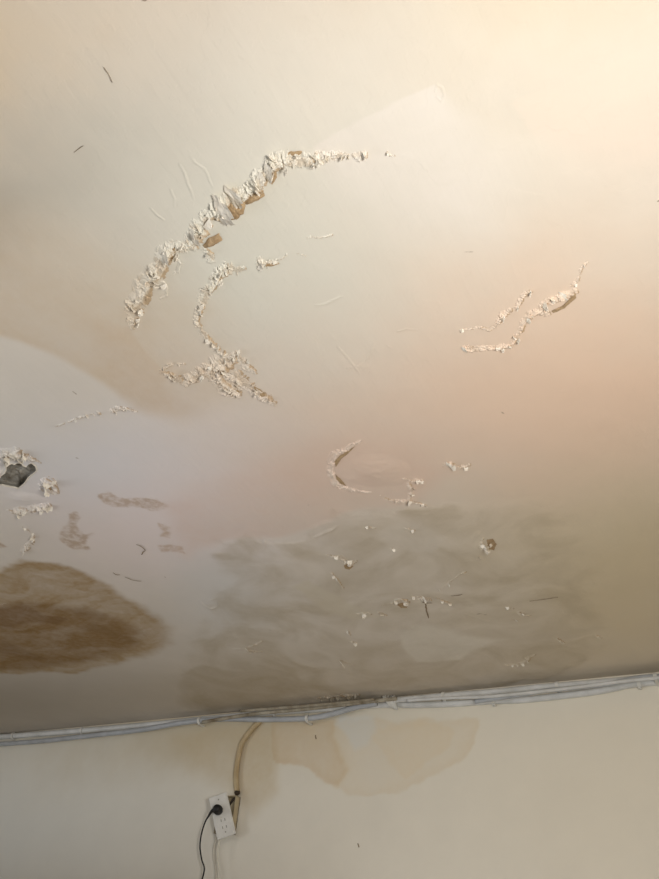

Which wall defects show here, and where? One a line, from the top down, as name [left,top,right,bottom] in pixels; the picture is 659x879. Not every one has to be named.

peeling [124,149,368,407]
peeling [459,261,588,353]
spalling [0,446,60,556]
peeling [326,440,427,507]
peeling [476,538,497,560]
water stain [0,421,627,826]